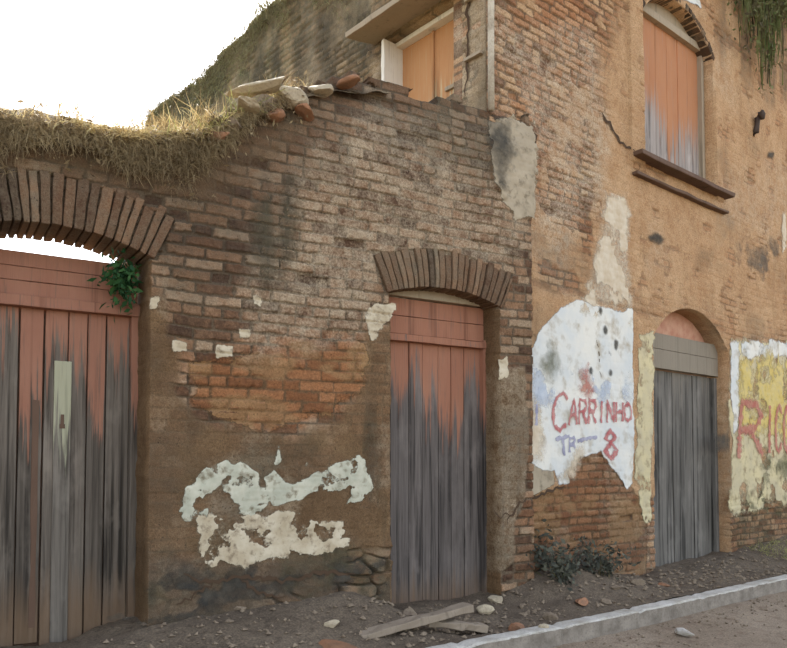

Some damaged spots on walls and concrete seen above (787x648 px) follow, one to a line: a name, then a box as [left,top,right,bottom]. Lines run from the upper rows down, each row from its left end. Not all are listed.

crack [463,1,471,94]
crack [602,113,635,151]
peeling [172,340,187,352]
spalling [188,302,396,433]
peeling [532,300,655,576]
peeling [717,338,787,517]
peeling [179,450,373,569]